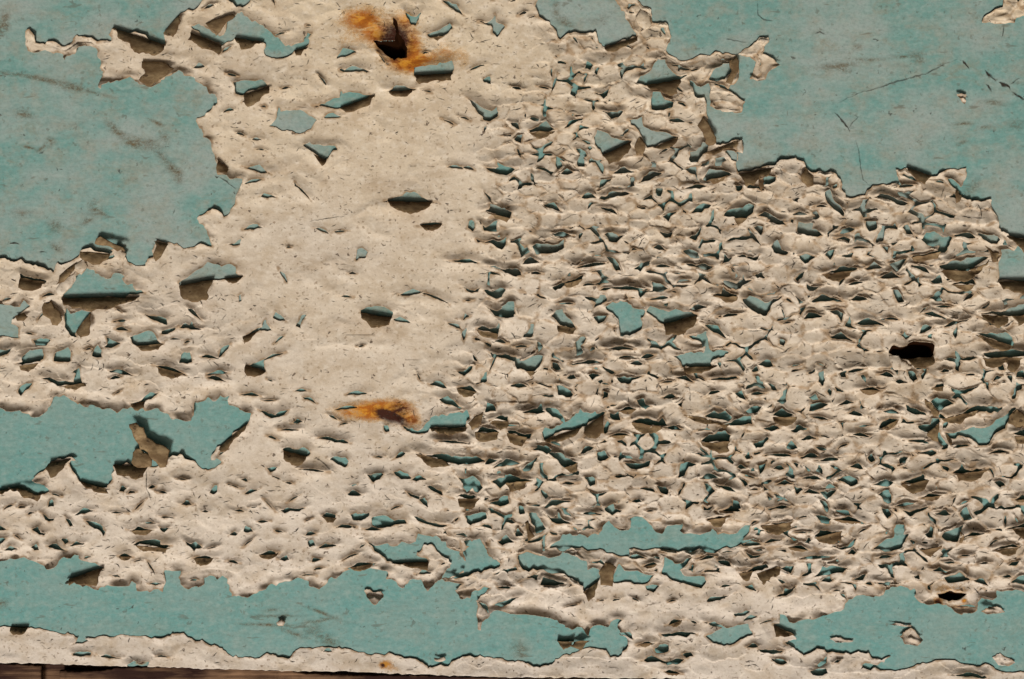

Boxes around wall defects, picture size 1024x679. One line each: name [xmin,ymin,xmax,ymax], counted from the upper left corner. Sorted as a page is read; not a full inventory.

rust [341,7,460,73]
peeling [528,0,1024,383]
rust [339,399,420,425]
peeling [0,0,796,679]
peeling [754,519,1024,679]